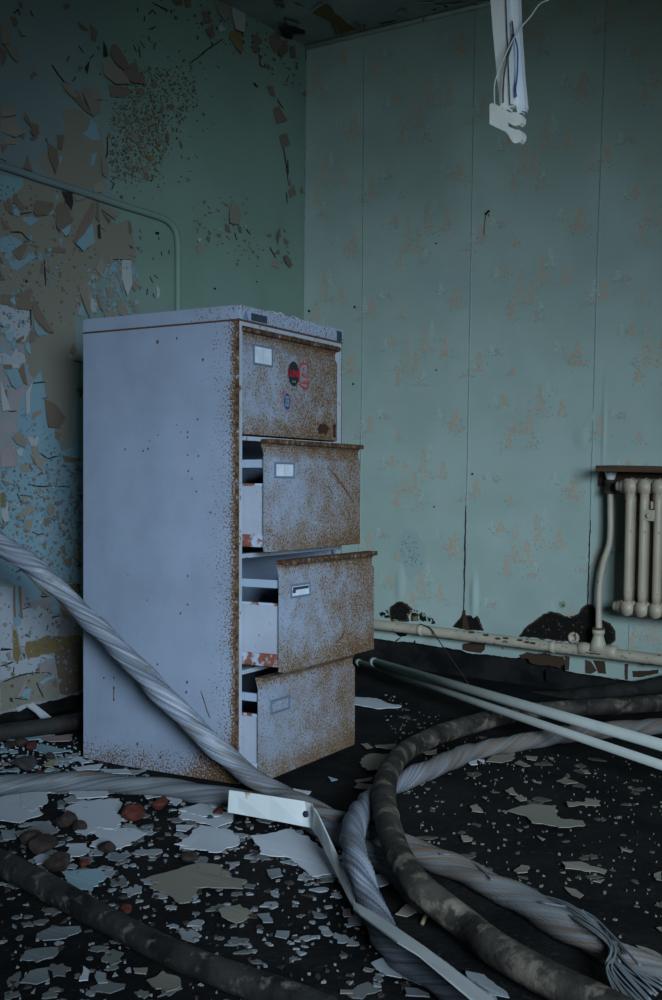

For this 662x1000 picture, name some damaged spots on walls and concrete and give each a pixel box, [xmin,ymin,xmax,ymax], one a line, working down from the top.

flaking render [0,60,196,593]
flaking render [0,668,60,712]